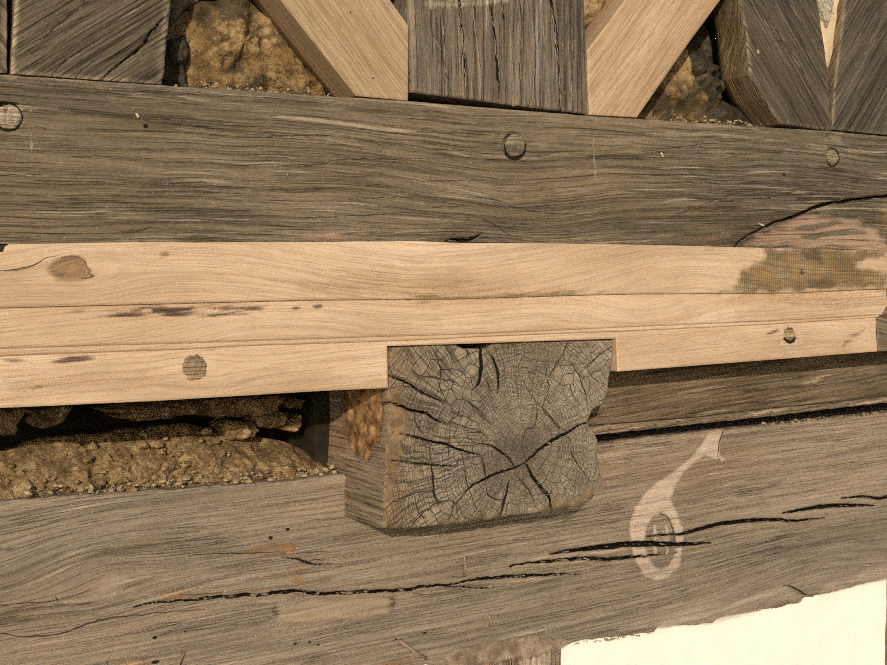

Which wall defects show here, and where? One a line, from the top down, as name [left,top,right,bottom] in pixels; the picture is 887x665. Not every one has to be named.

crack [676,181,887,247]
crack [0,255,58,271]
leakage [735,248,887,293]
crack [379,342,611,529]
crack [0,496,887,638]